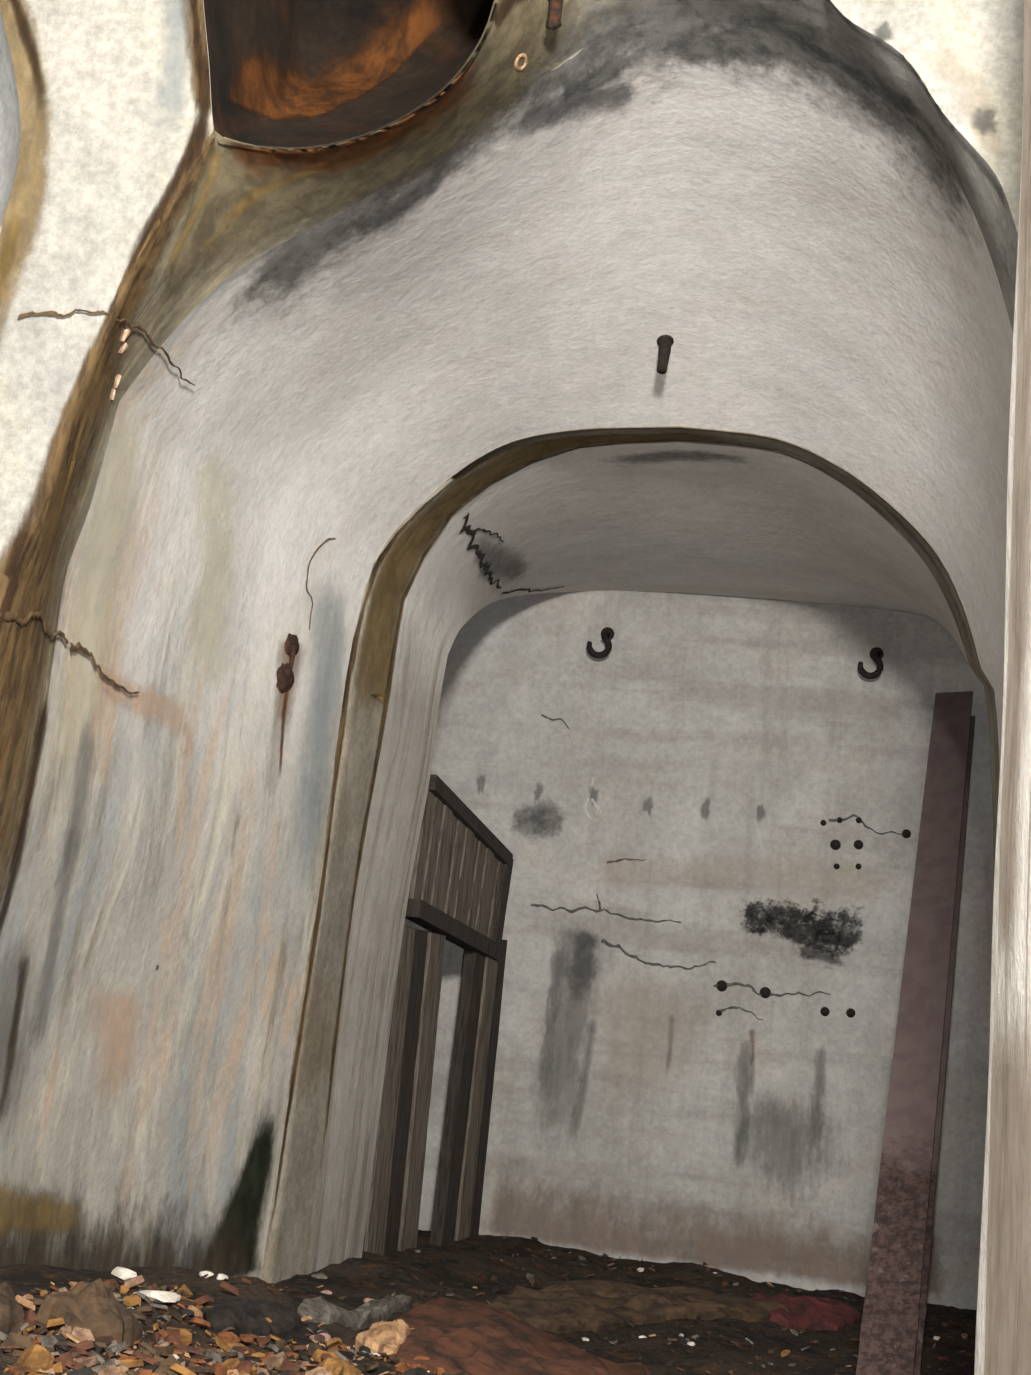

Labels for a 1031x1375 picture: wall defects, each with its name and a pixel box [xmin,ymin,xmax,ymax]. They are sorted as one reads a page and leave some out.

crack [18,309,195,386]
damp [0,0,1003,930]
crack [459,513,564,594]
crack [0,610,140,695]
corrosion [280,691,290,769]
damp [998,0,1031,1375]
damp [271,434,971,1223]
crack [829,814,903,835]
damp [37,839,73,1029]
crack [531,858,831,1020]
damp [1,962,27,1107]